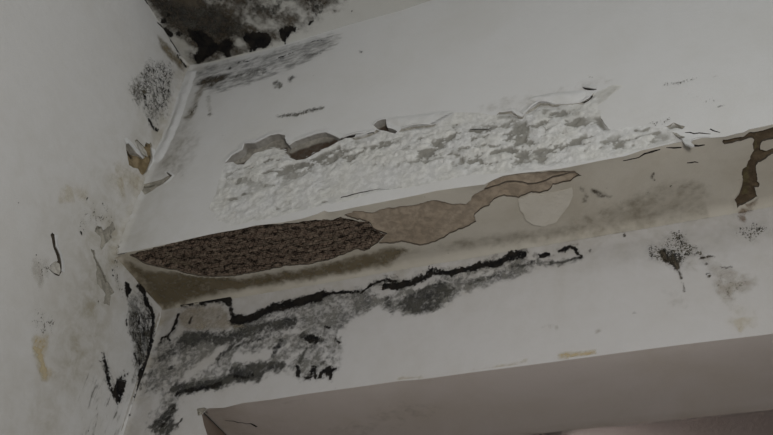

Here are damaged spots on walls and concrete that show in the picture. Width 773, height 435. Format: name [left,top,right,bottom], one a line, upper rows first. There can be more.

damp [129,0,337,132]
spalling [124,137,175,195]
spalling [222,128,346,165]
spalling [371,117,397,133]
peeling [672,131,712,147]
spalling [722,127,773,209]
flaking render [130,171,581,277]
damp [649,230,712,279]
damp [100,245,591,435]